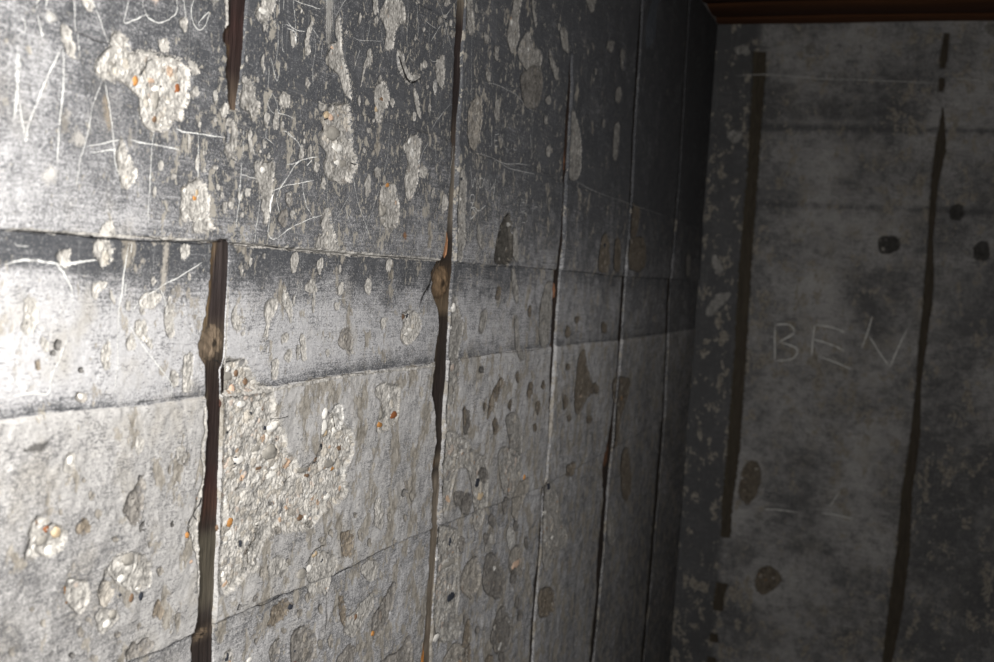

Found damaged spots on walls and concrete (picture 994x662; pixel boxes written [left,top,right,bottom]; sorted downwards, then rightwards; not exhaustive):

spalling [94,28,201,134]
spalling [5,54,295,269]
spalling [299,12,428,231]
spalling [412,54,446,121]
spalling [431,169,467,268]
spalling [91,281,116,305]
spalling [215,206,441,662]
spalling [24,452,103,562]